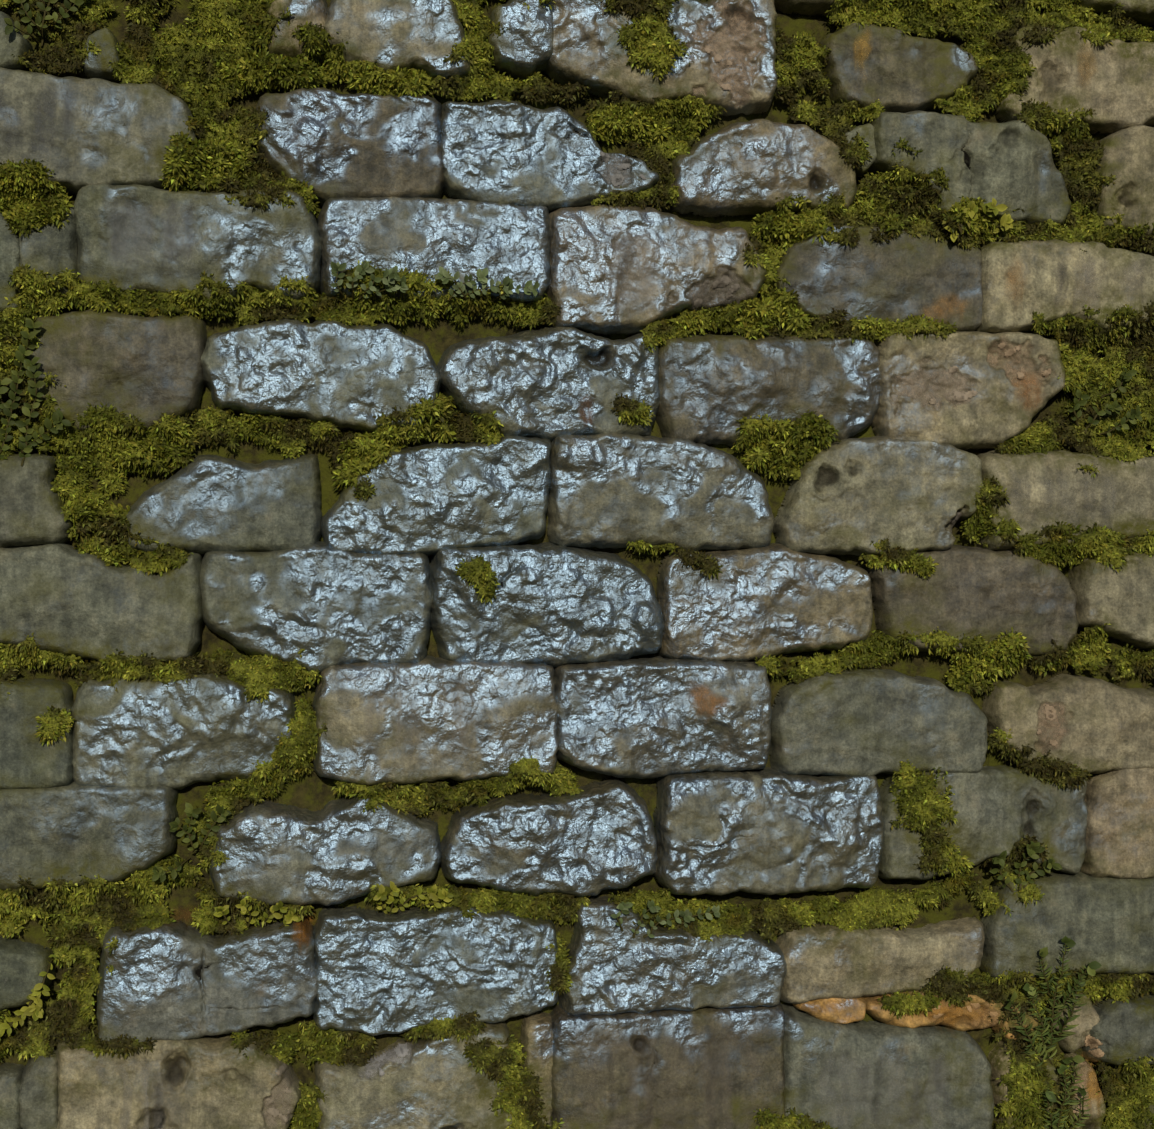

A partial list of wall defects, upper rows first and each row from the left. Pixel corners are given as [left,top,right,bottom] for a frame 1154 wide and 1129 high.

crack [961,146,971,169]